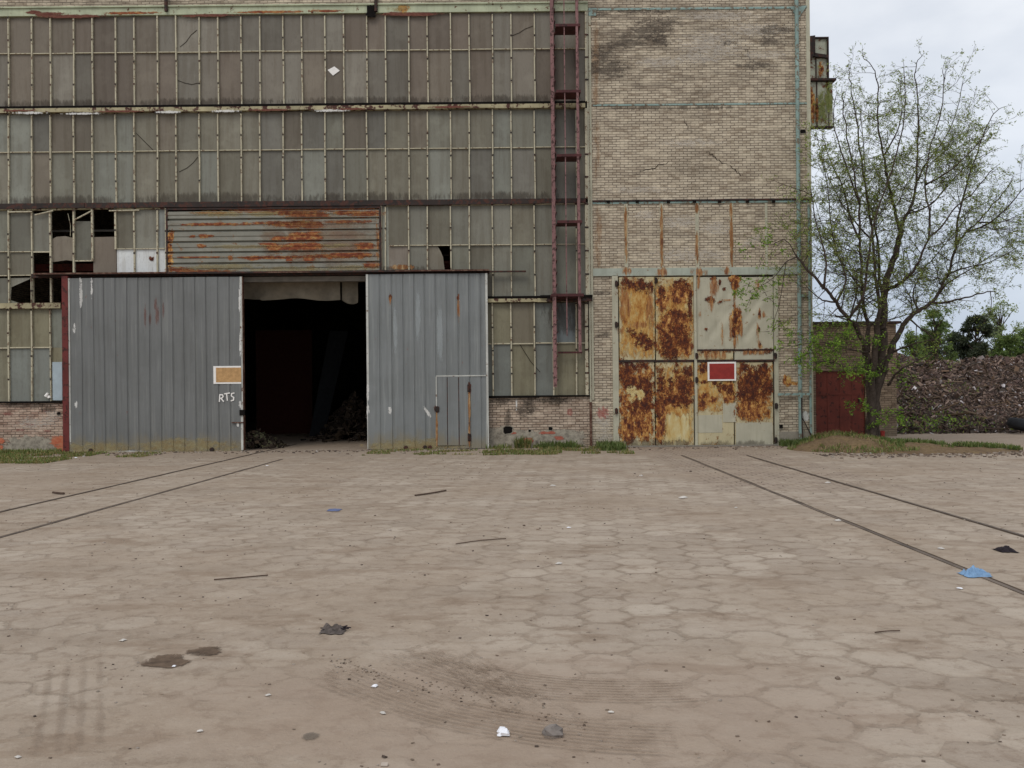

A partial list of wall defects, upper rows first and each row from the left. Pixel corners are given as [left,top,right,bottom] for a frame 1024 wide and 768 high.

damp [588,10,675,77]
damp [762,25,794,46]
corrosion [165,208,414,272]
corrosion [618,203,798,446]